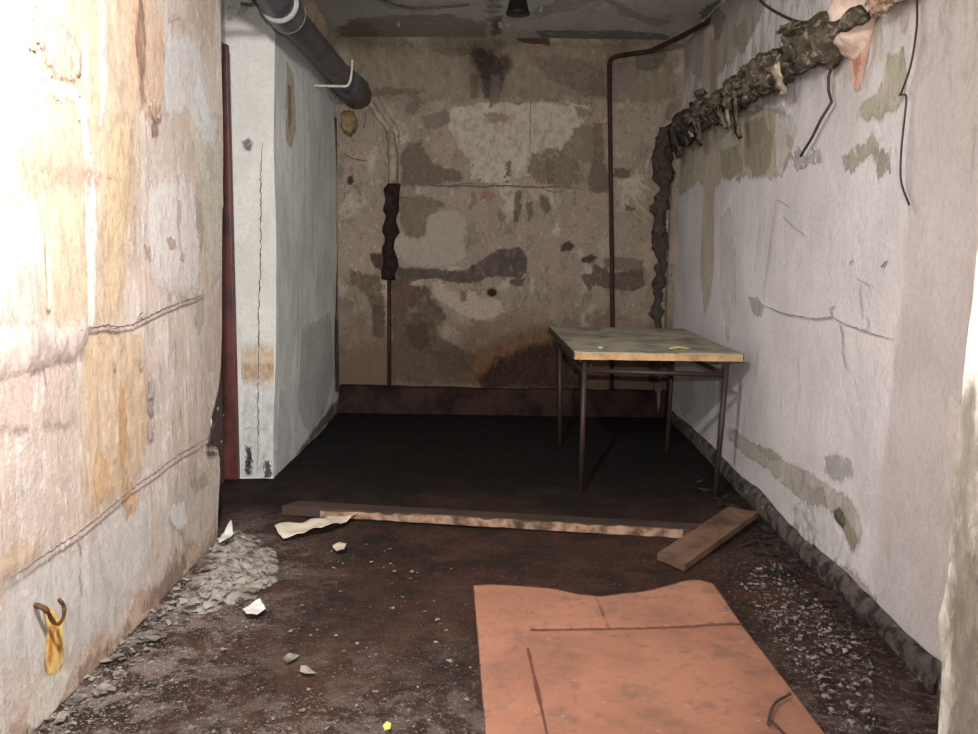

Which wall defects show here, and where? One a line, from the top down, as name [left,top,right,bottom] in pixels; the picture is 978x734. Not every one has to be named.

flaking render [32,7,94,178]
crack [81,294,206,331]
crack [244,144,266,475]
damp [350,247,527,385]
damp [335,0,765,129]
damp [513,123,631,222]
damp [679,106,796,338]
crack [763,200,890,369]
damp [841,134,891,178]
crack [6,437,209,590]
damp [728,429,860,546]
corrosion [45,607,64,675]